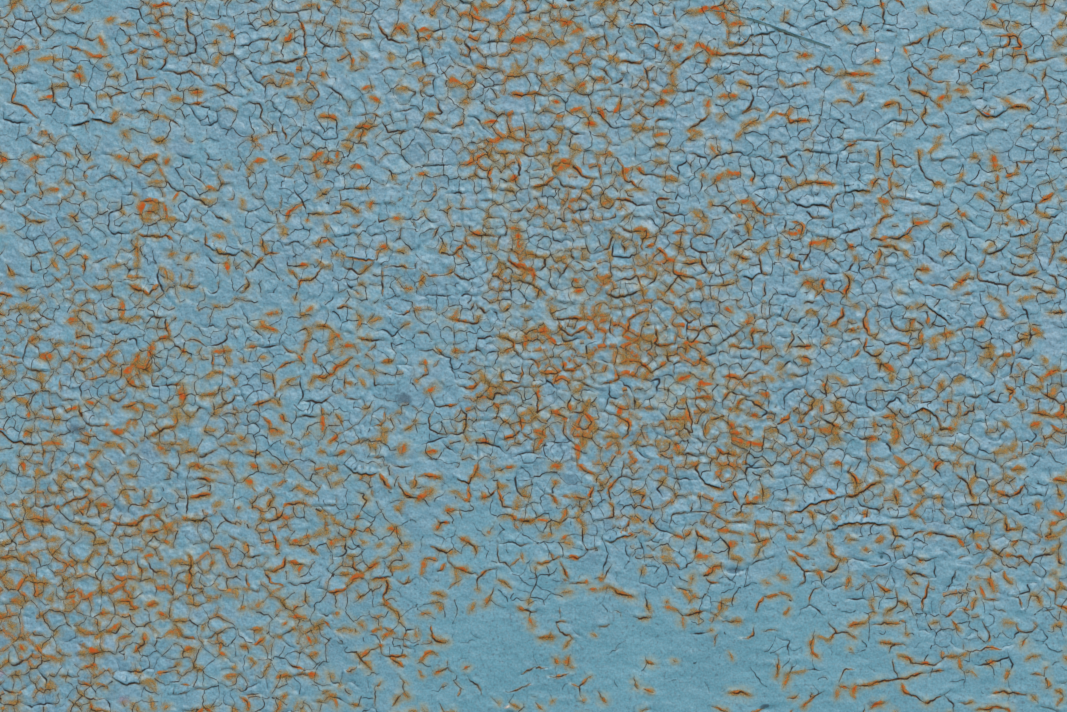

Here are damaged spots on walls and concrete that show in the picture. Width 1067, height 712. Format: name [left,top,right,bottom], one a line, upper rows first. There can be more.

rust [301,85,379,177]
rust [449,0,720,227]
rust [433,202,793,573]
rust [984,327,1067,444]
rust [0,299,417,712]
rust [834,414,941,536]
crack [488,533,566,613]
crack [755,594,774,610]
crack [786,550,870,613]
crack [509,661,618,712]
crack [749,629,849,704]
crack [979,690,1025,712]